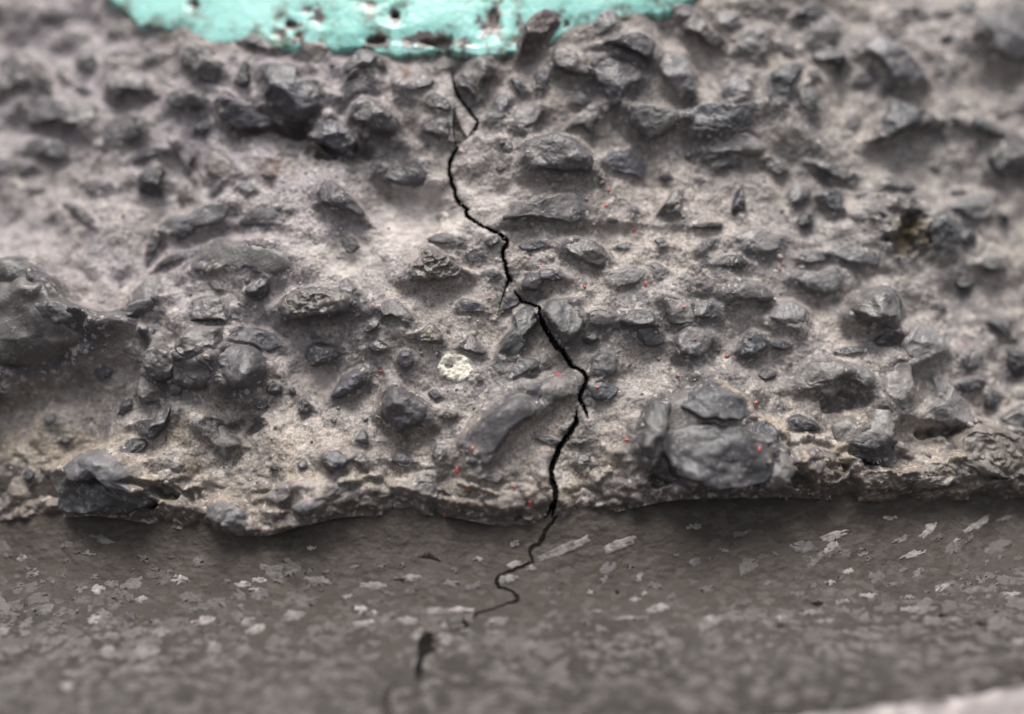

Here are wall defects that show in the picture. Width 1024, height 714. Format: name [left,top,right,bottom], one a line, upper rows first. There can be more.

peeling [110,0,694,61]
crack [382,73,588,714]